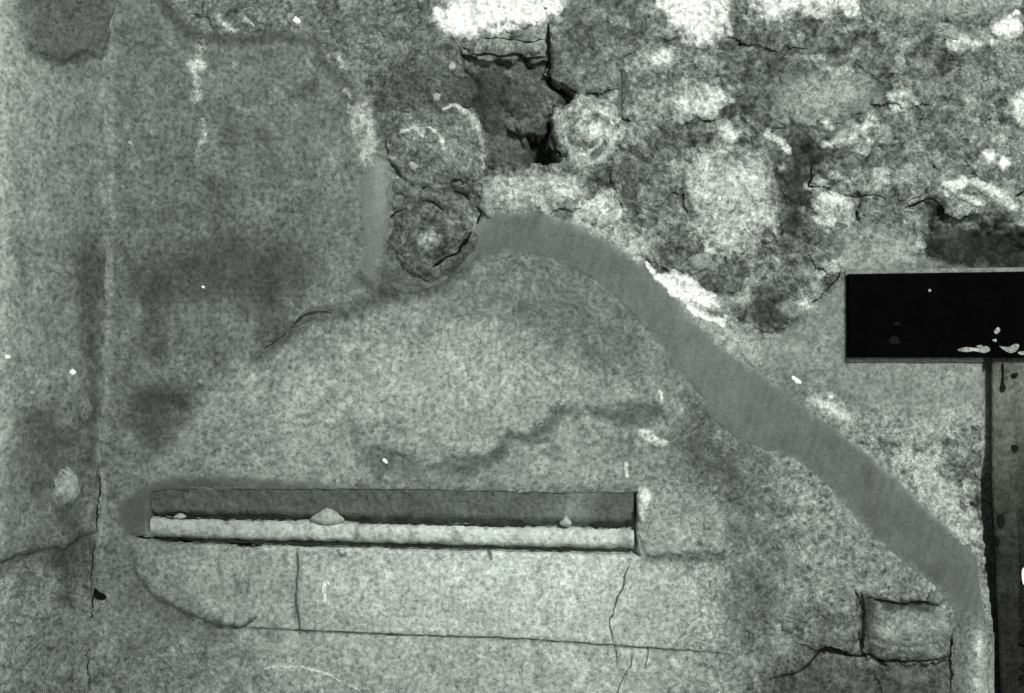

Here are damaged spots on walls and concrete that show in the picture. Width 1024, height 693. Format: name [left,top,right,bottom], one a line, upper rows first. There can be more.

crack [463,22,572,158]
crack [390,187,482,268]
damp [577,209,764,370]
crack [807,161,940,211]
damp [842,230,910,264]
damp [638,429,668,446]
damp [806,394,854,422]
damp [635,487,750,556]
damp [892,445,1005,552]
crack [2,462,101,686]
crack [131,511,719,693]
crack [769,589,954,690]